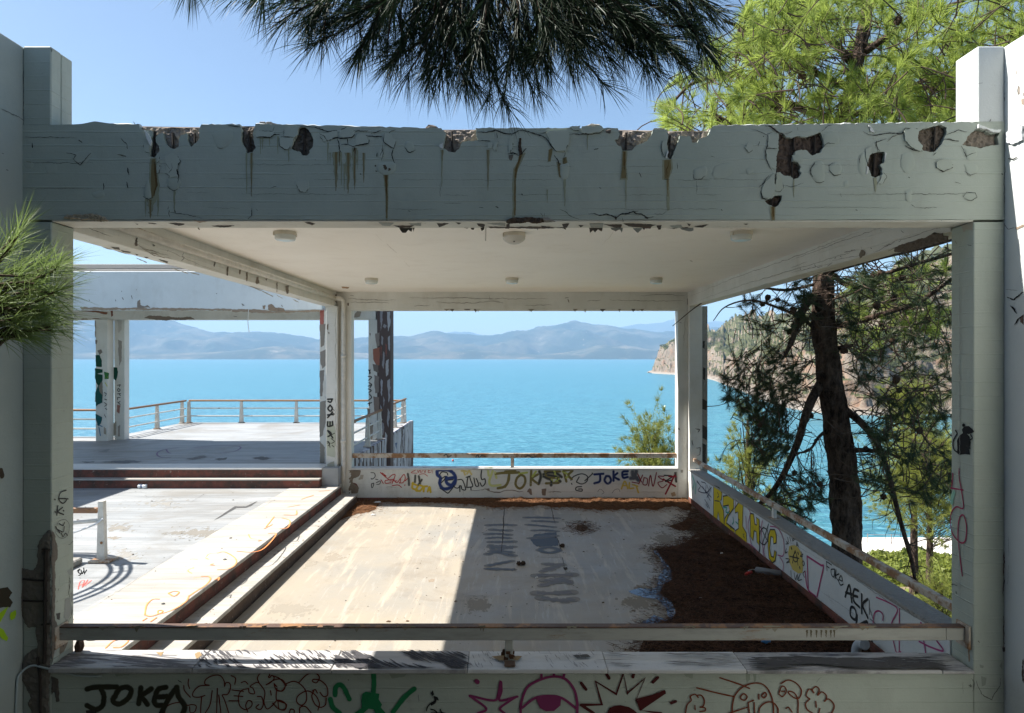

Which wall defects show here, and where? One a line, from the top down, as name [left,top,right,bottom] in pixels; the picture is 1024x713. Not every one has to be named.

crack [2,71,200,218]
rust [139,158,160,231]
spalling [142,126,200,173]
rust [327,142,365,191]
rust [512,153,525,218]
spalling [437,216,709,233]
spalling [546,126,652,152]
spalling [762,125,823,207]
spalling [892,232,949,255]
spalling [903,126,944,152]
crack [220,125,977,497]
spalling [21,530,73,713]